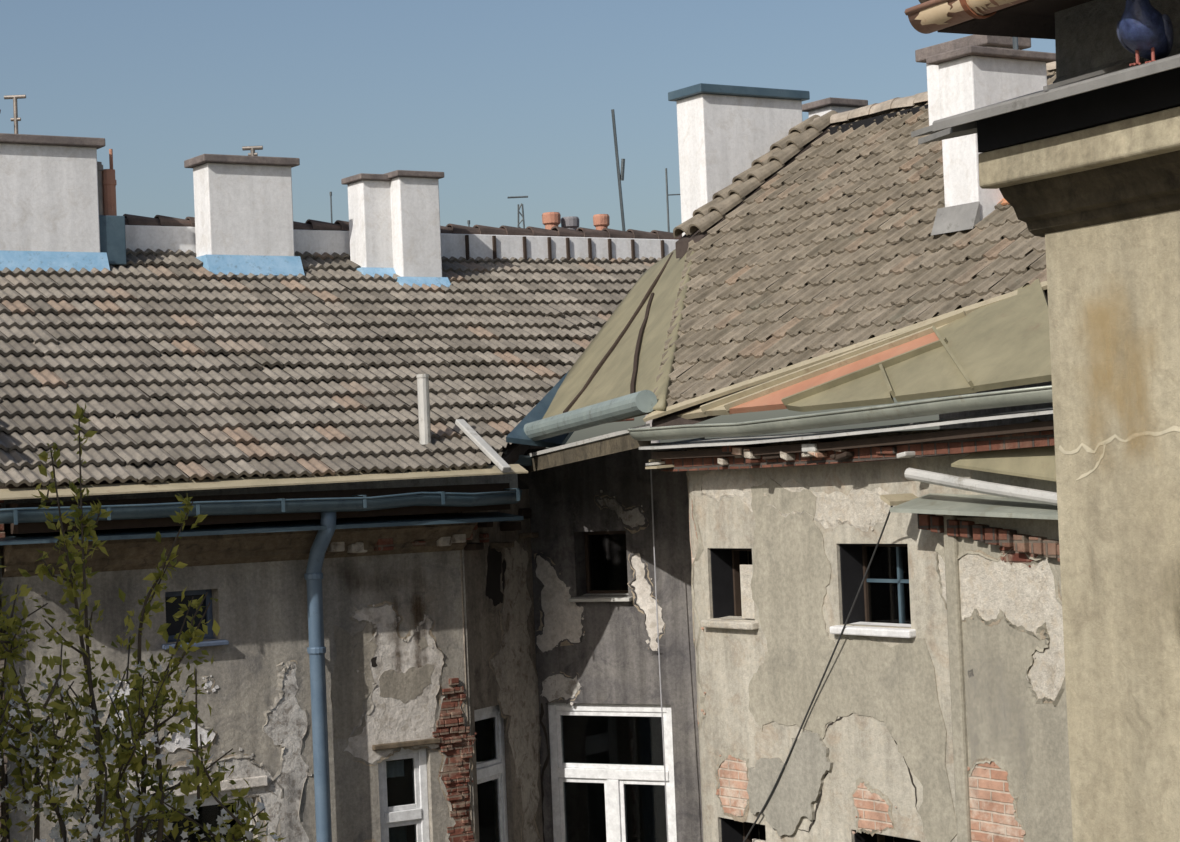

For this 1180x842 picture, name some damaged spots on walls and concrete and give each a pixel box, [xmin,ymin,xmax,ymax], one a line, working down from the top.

crack [1059,426,1180,484]
peeling [594,490,649,534]
peeling [627,548,665,656]
peeling [935,543,1066,706]
peeling [104,660,314,842]
peeling [330,601,477,842]
peeling [484,537,587,842]
flaking render [715,748,749,822]
flaking render [967,757,1025,842]